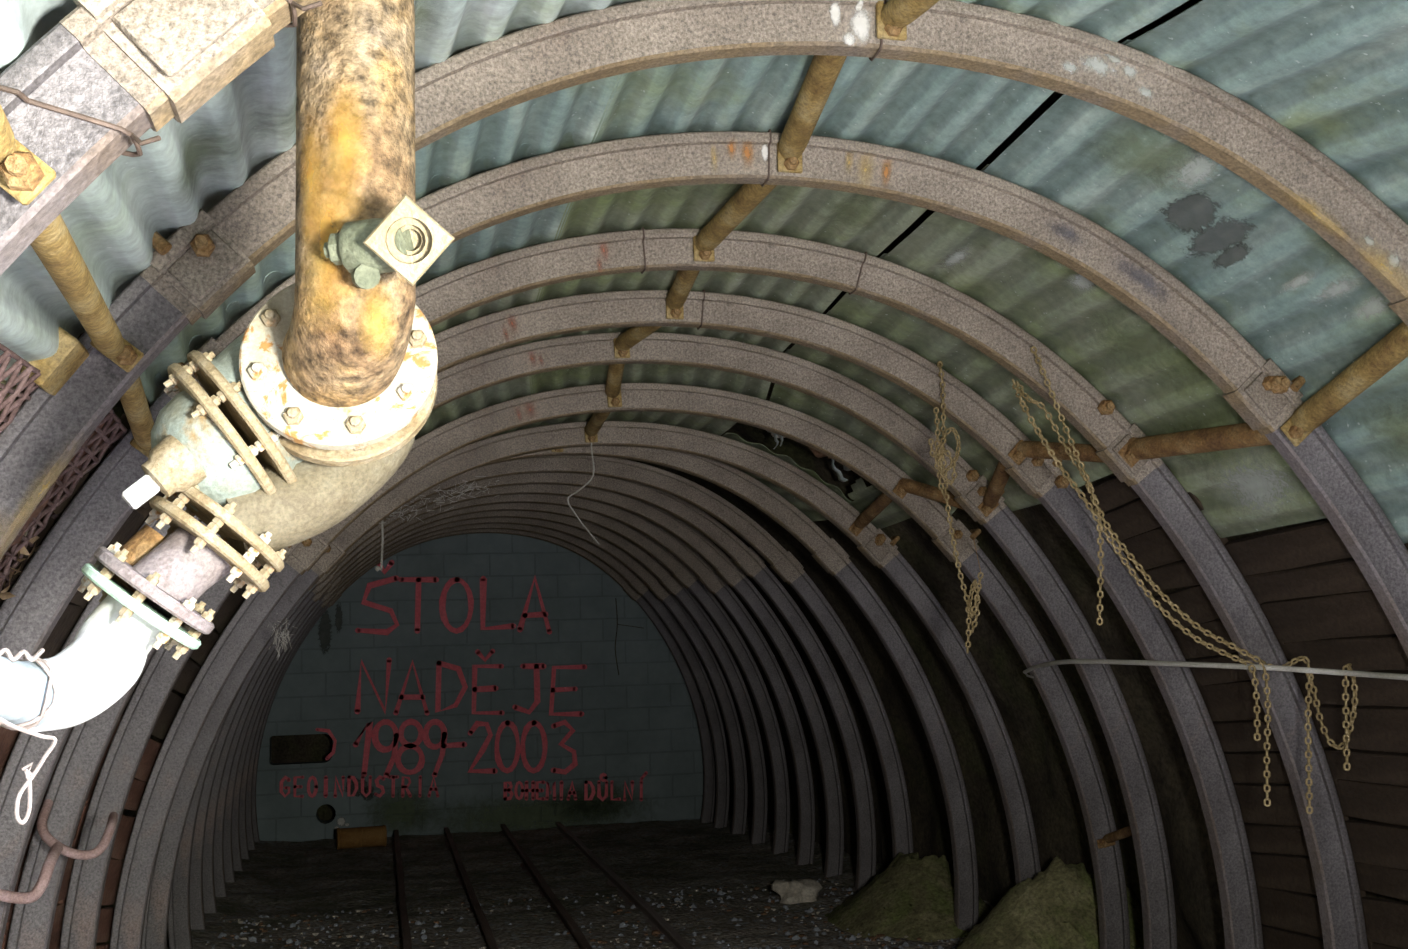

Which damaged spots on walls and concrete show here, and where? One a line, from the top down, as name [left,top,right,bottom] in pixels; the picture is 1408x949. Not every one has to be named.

water stain [1160,158,1256,268]